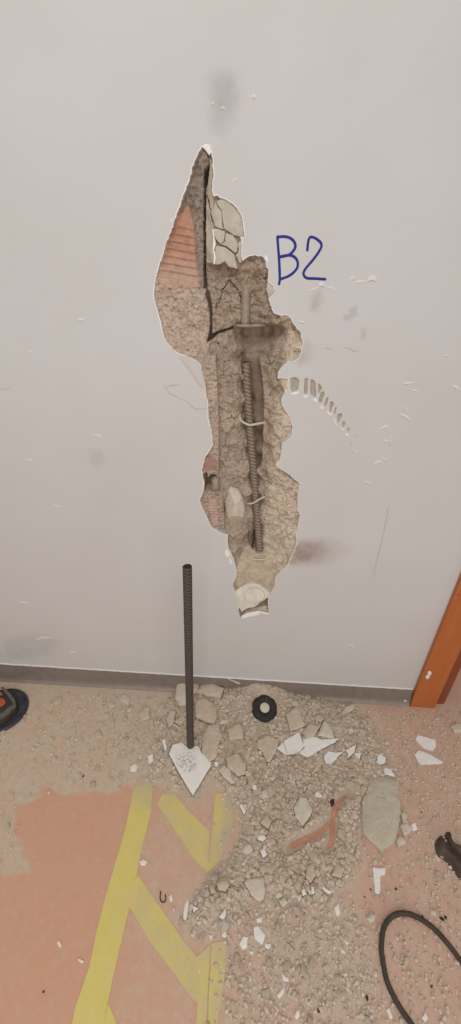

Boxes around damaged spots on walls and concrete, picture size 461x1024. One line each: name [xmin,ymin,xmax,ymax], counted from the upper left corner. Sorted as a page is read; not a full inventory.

spalling [153,144,358,619]